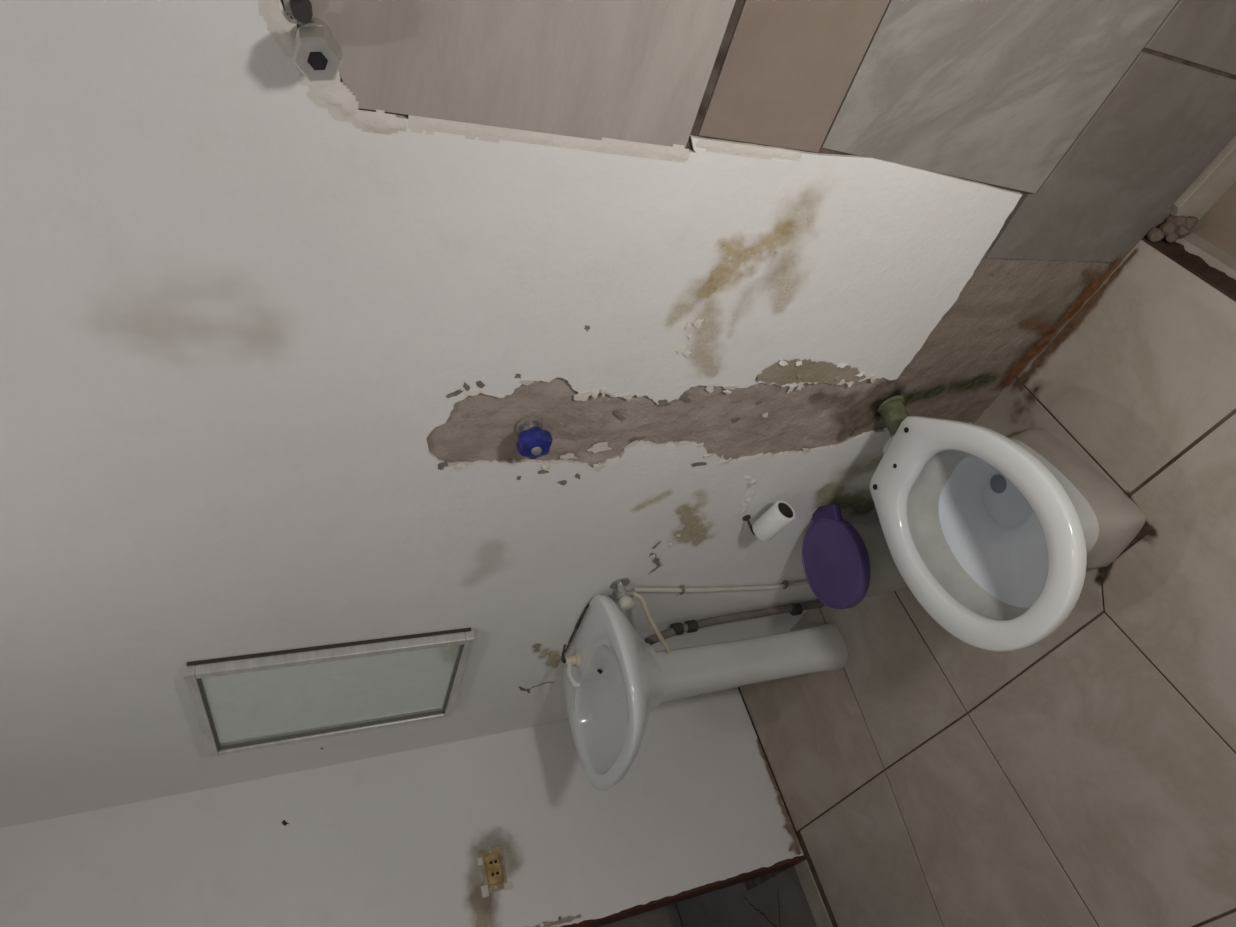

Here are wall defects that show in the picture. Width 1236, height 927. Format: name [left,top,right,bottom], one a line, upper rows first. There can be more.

damp [699,223,790,298]
spalling [426,249,1121,485]